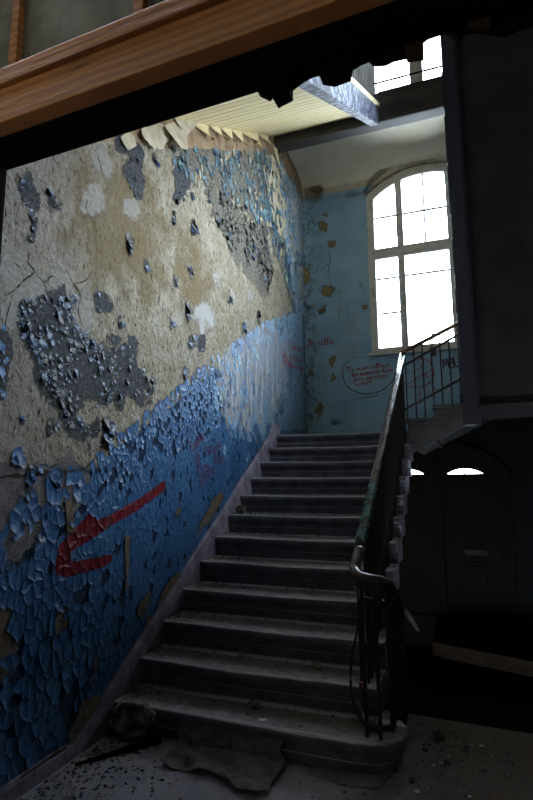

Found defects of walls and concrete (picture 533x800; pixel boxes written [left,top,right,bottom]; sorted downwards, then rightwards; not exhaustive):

crack [5,254,95,326]
peeling [0,119,340,787]